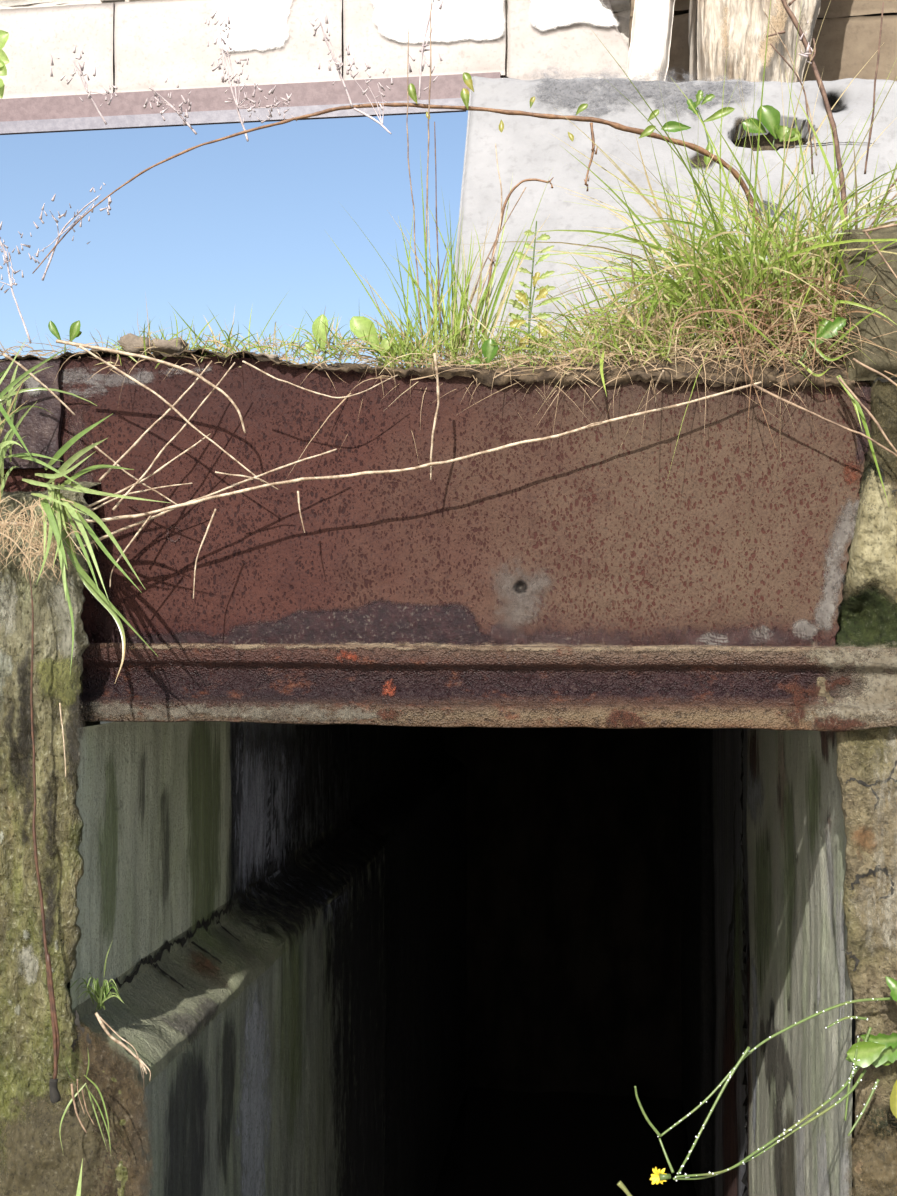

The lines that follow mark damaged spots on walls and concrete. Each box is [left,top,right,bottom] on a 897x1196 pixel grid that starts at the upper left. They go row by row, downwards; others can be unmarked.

leakage [537,70,753,115]
corrosion [843,384,871,485]
corrosion [64,409,860,662]
corrosion [784,676,866,732]
leakage [0,573,388,1196]